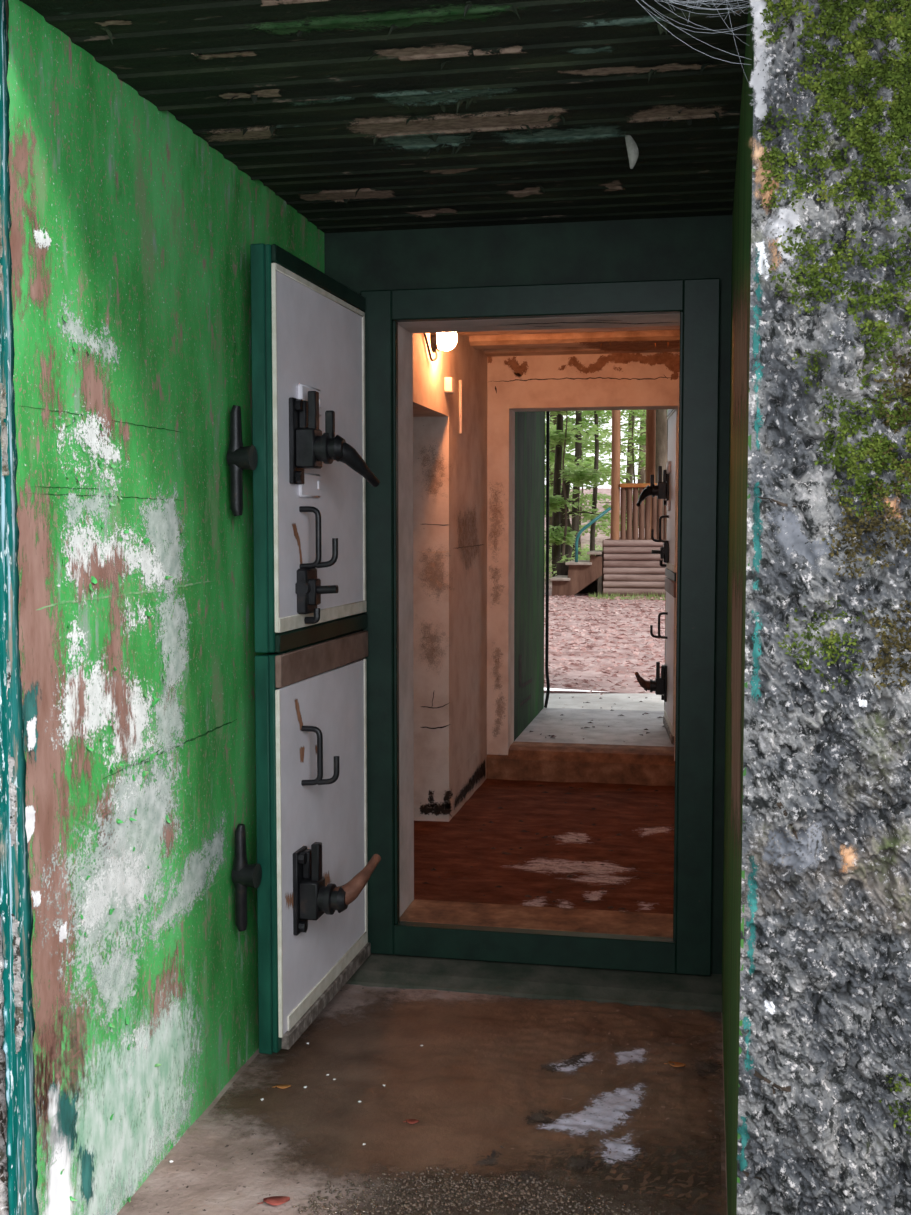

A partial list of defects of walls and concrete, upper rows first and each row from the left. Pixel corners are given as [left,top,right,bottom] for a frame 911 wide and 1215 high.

peeling [245,0,528,69]
peeling [576,14,668,36]
peeling [558,46,716,82]
peeling [204,125,279,142]
peeling [346,87,724,174]
peeling [300,187,395,204]
rust [34,332,129,459]
spalling [488,356,528,377]
spalling [559,339,680,380]
rust [17,474,137,1191]
peeling [25,406,229,1215]
water stain [216,991,727,1215]